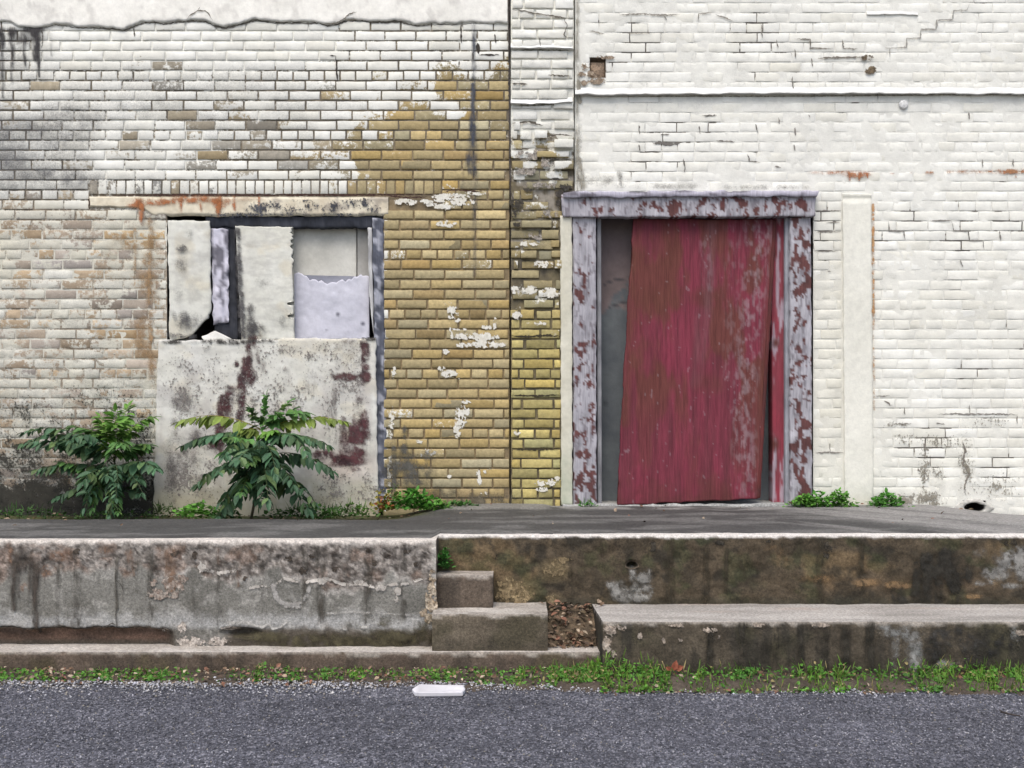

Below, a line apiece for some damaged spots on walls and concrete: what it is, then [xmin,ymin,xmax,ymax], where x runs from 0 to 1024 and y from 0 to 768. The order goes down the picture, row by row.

water stain [0,27,43,98]
water stain [467,33,476,173]
crack [1,0,1012,214]
rust [828,171,870,181]
rust [114,196,235,374]
peeling [351,121,573,511]
water stain [878,421,1019,506]
water stain [11,552,44,633]
flaking render [147,548,438,624]
water stain [227,549,432,647]
water stain [607,566,651,602]
water stain [891,547,1024,604]